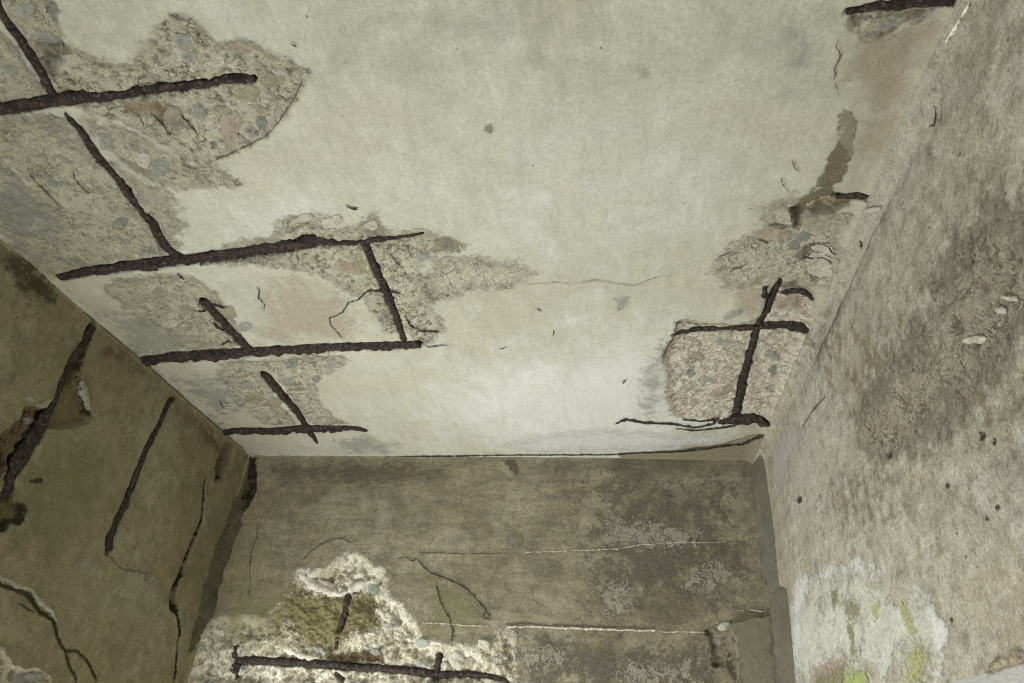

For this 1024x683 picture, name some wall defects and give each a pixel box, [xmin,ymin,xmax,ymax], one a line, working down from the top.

spalling [0,0,538,444]
spalling [662,192,870,427]
leakage [789,110,857,211]
crack [0,574,97,681]
crack [82,311,246,682]
crack [397,557,491,642]
spalling [188,470,753,683]